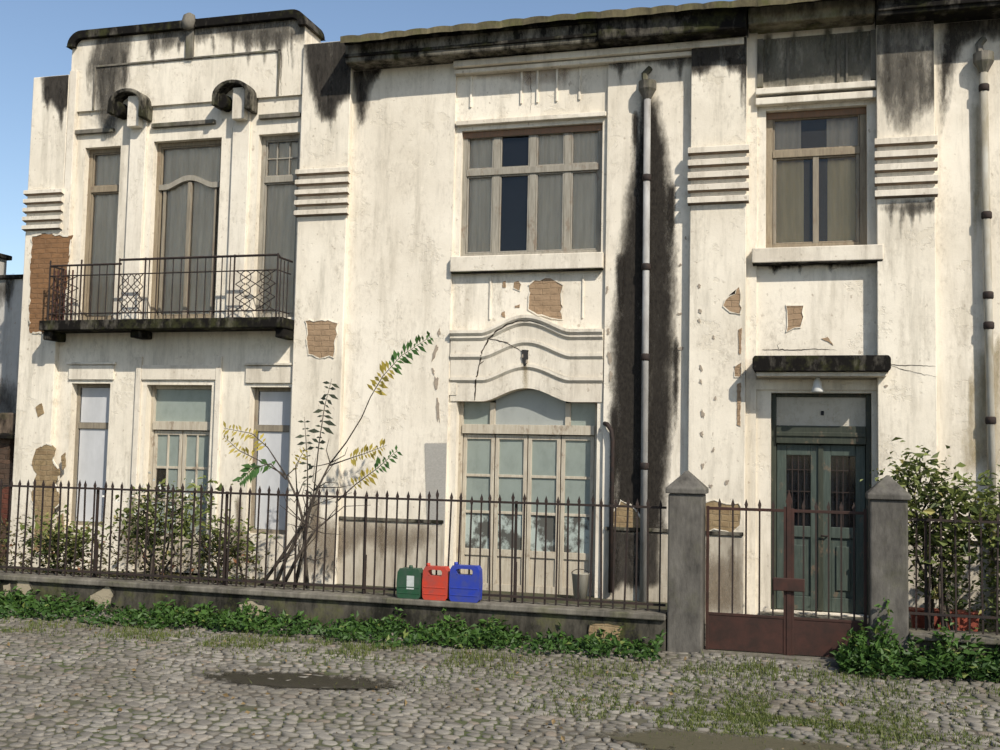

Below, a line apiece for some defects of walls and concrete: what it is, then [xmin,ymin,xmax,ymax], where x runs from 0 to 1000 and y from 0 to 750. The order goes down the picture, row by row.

water stain [42,75,69,123]
water stain [86,36,131,134]
water stain [148,20,380,122]
water stain [763,19,1000,127]
spalling [28,233,73,334]
spalling [305,319,339,359]
crack [474,320,541,400]
spalling [501,277,564,320]
water stain [611,100,679,589]
spalling [786,305,804,332]
spalling [31,443,66,553]
spalling [706,485,742,532]